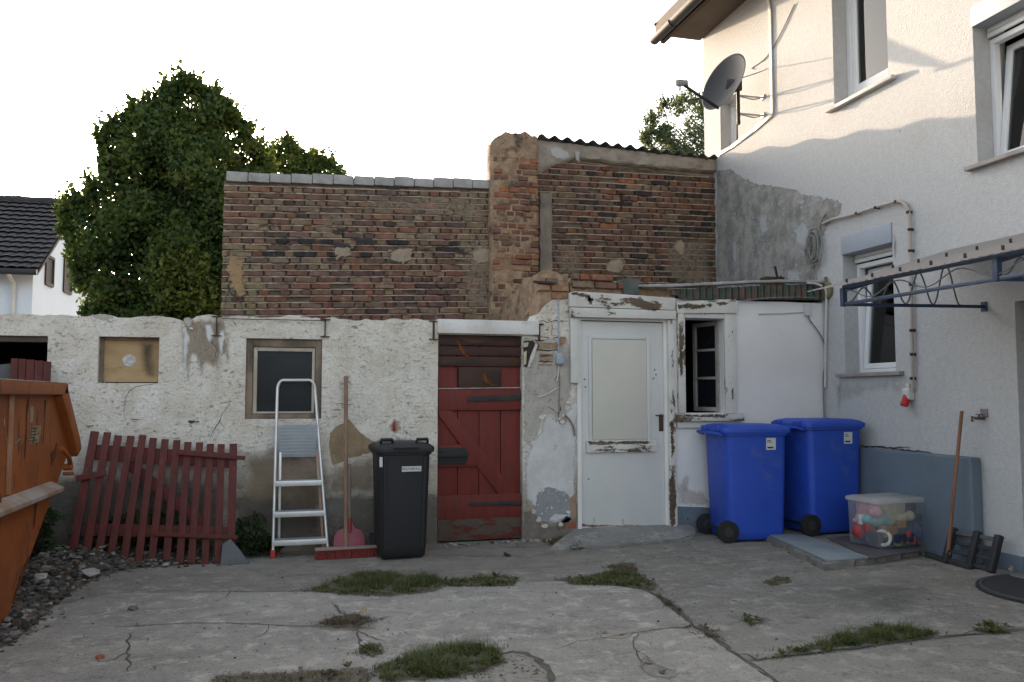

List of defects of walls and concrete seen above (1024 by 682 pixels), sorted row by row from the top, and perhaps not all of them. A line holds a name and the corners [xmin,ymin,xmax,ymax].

peeling [709,169,841,287]
water stain [182,321,226,368]
flaking render [523,335,575,445]
flaking render [328,419,375,490]
peeling [588,441,649,452]
flaking render [524,487,578,540]
peeling [669,475,677,526]